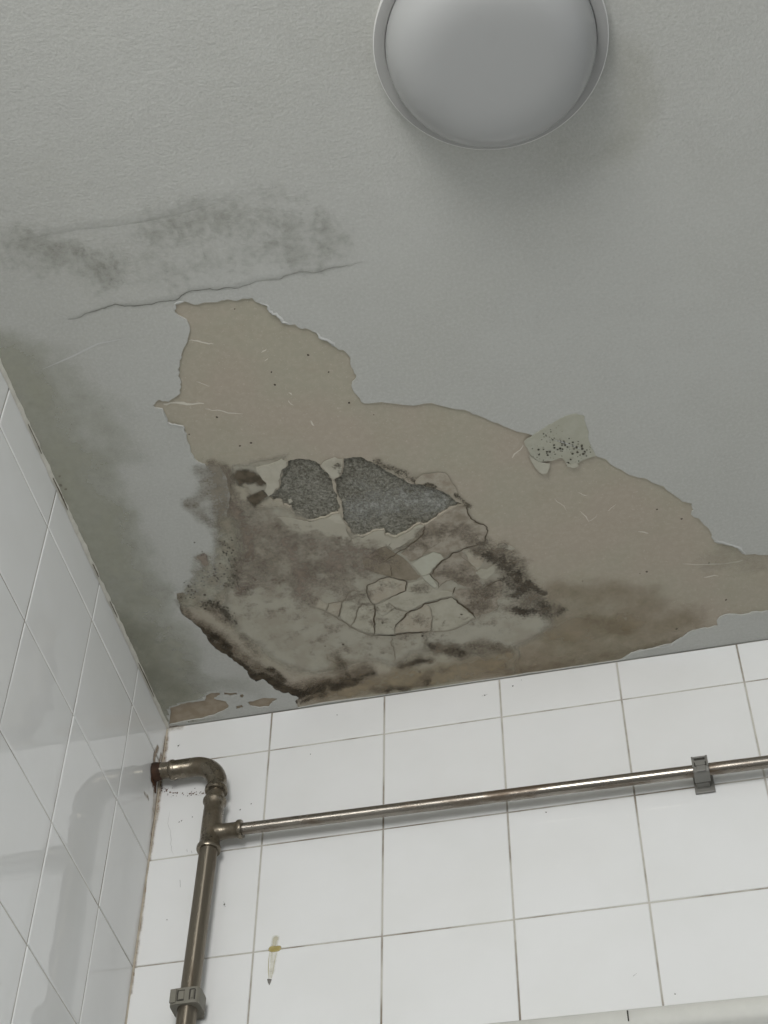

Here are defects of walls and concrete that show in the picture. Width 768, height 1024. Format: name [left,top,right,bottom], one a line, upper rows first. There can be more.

peeling [154,298,768,707]
damp [177,459,514,703]
crack [314,507,503,661]
damp [413,525,646,653]
peeling [169,693,276,724]
rust [147,737,204,837]